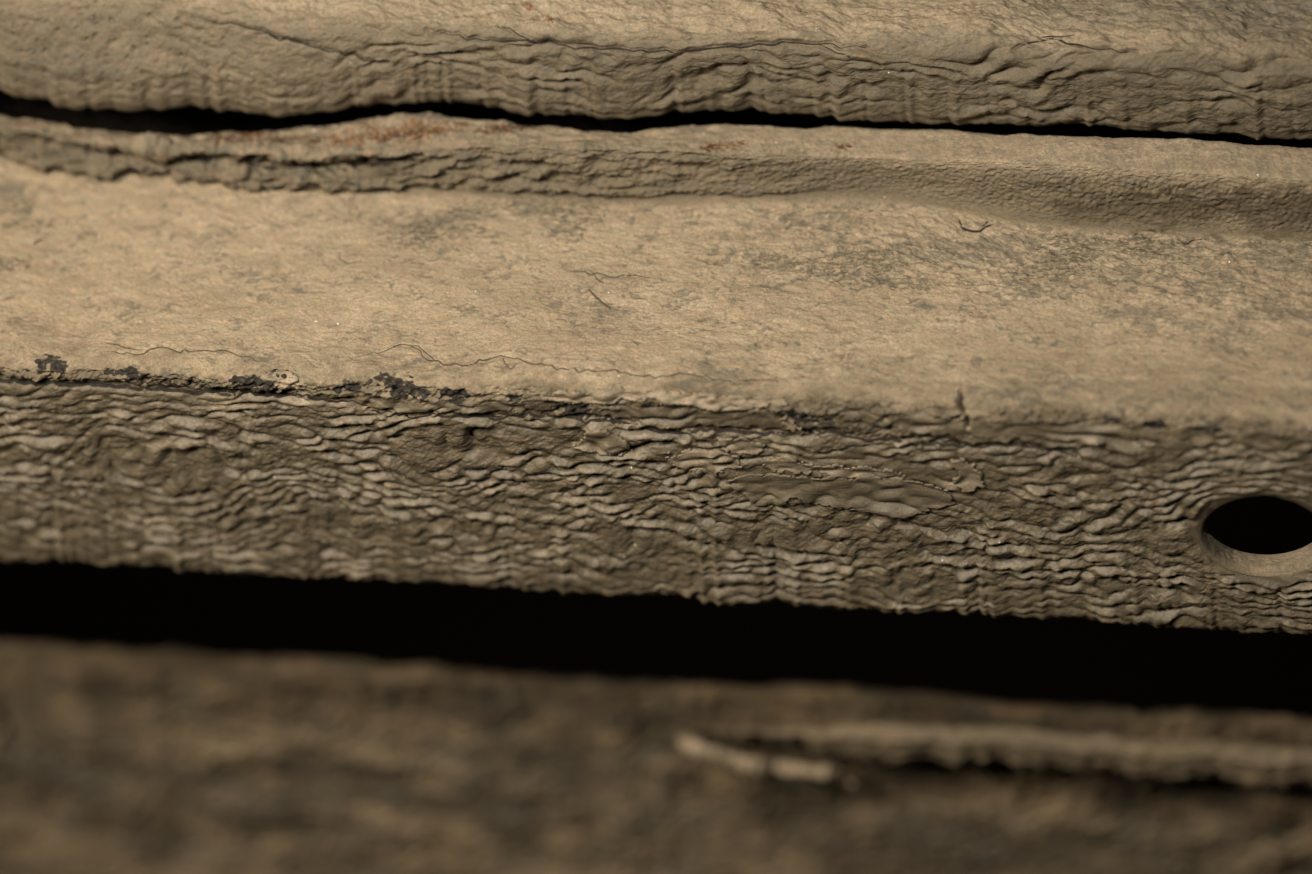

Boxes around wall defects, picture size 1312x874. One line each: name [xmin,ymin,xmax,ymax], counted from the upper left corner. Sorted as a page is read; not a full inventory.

crack [181,12,380,63]
rust [201,116,535,150]
crack [0,90,1312,191]
crack [958,218,993,233]
peeling [25,353,68,374]
peeling [103,366,170,383]
peeling [188,369,298,397]
peeling [332,369,469,404]